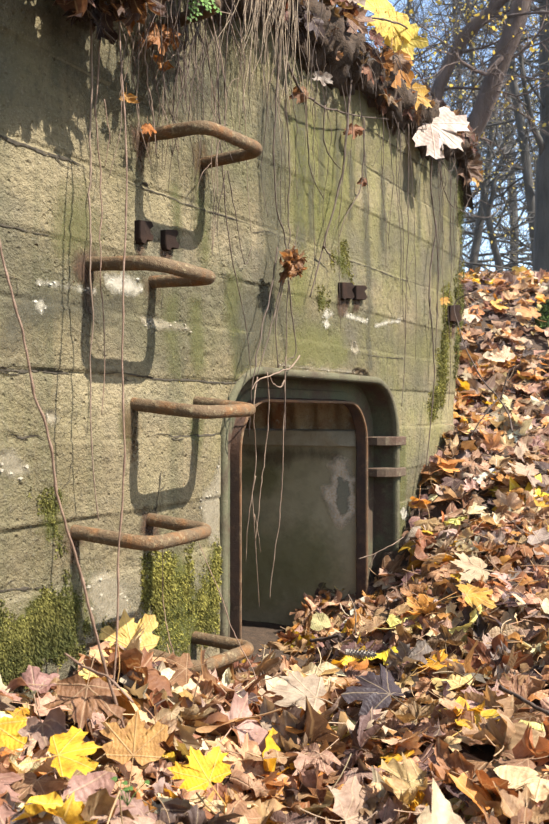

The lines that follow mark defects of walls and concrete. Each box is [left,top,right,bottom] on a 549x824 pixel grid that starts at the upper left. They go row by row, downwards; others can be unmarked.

crack [0,135,294,242]
rust [142,512,159,536]
peeling [321,459,355,528]